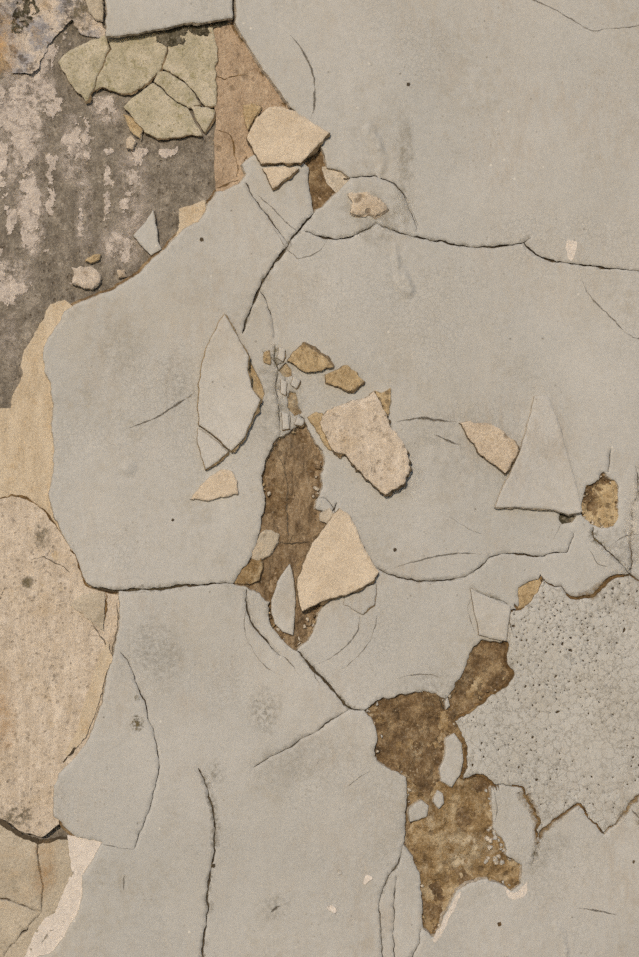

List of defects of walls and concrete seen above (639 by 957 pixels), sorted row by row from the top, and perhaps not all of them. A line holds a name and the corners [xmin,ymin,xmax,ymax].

spalling [0,0,348,408]
crack [217,130,632,333]
peeling [190,314,264,502]
peeling [233,342,412,650]
crack [377,482,639,600]
peeling [459,395,618,528]
peeling [0,495,119,837]
crack [0,494,226,849]
crack [198,768,216,957]
crack [244,599,376,765]
peeling [365,574,639,942]
crack [460,747,639,856]